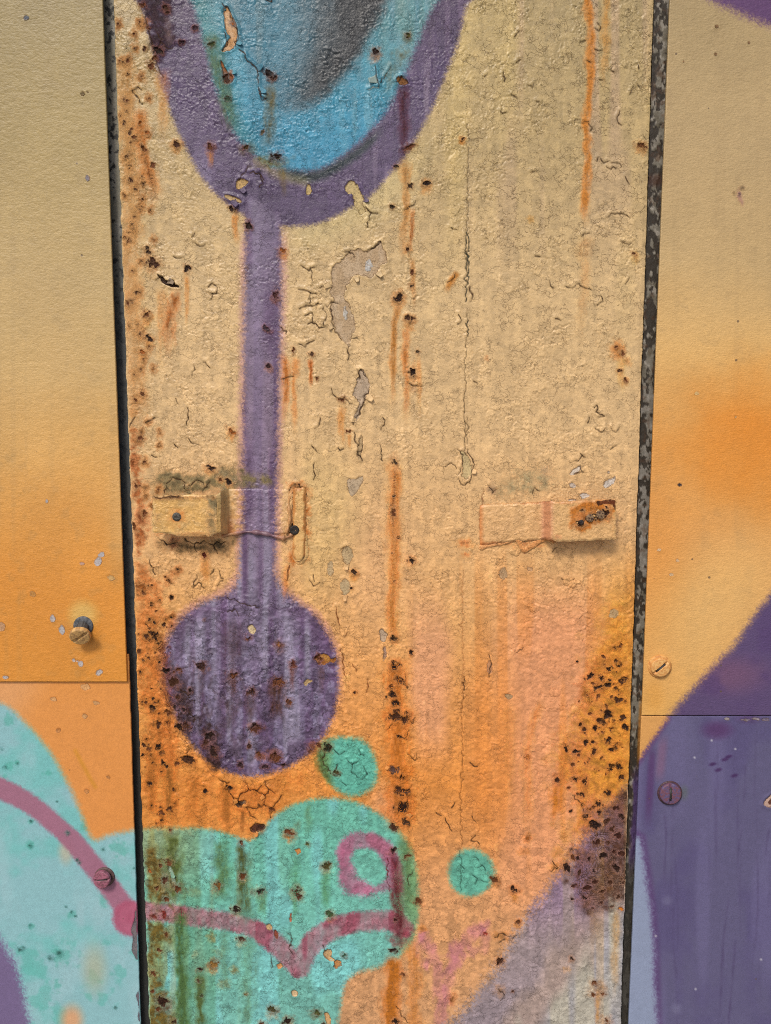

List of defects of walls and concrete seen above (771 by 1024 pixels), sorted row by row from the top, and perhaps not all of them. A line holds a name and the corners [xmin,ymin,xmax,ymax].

peeling [219,3,242,97]
peeling [324,241,387,359]
rust [389,76,432,405]
crack [451,136,477,451]
rust [115,0,288,833]
peeling [350,369,373,460]
rust [386,458,416,642]
rust [569,499,616,532]
crack [220,780,282,818]
rust [383,649,416,832]
rust [551,608,632,965]
rust [144,847,195,1024]